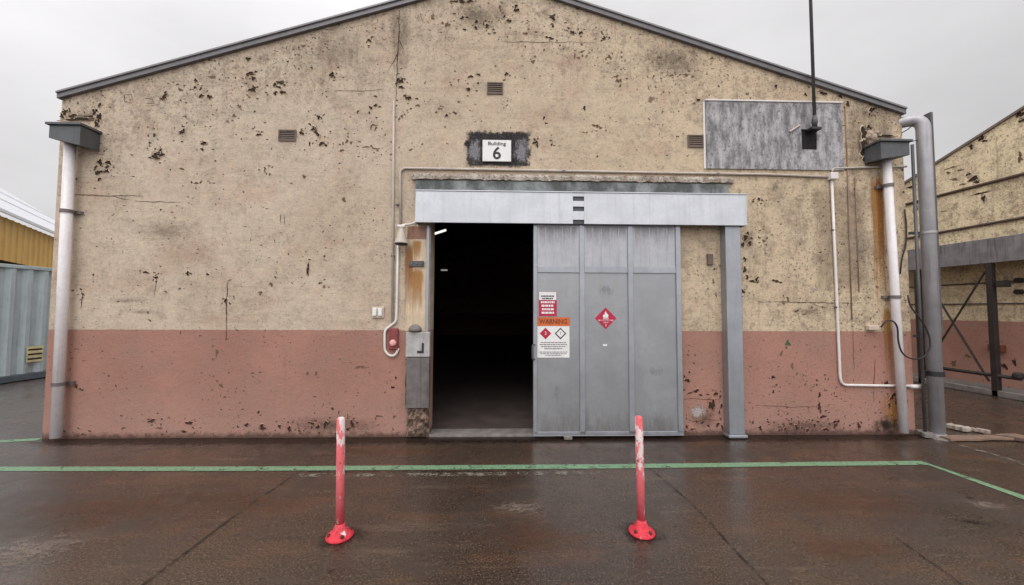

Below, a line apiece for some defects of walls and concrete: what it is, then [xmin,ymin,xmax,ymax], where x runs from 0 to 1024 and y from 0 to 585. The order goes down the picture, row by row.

spalling [57,102,109,144]
spalling [147,56,313,197]
spalling [857,105,898,165]
spalling [75,157,118,189]
crack [74,194,162,202]
corrosion [871,182,884,266]
corrosion [405,241,422,297]
spalling [683,354,724,432]
spalling [746,339,862,433]